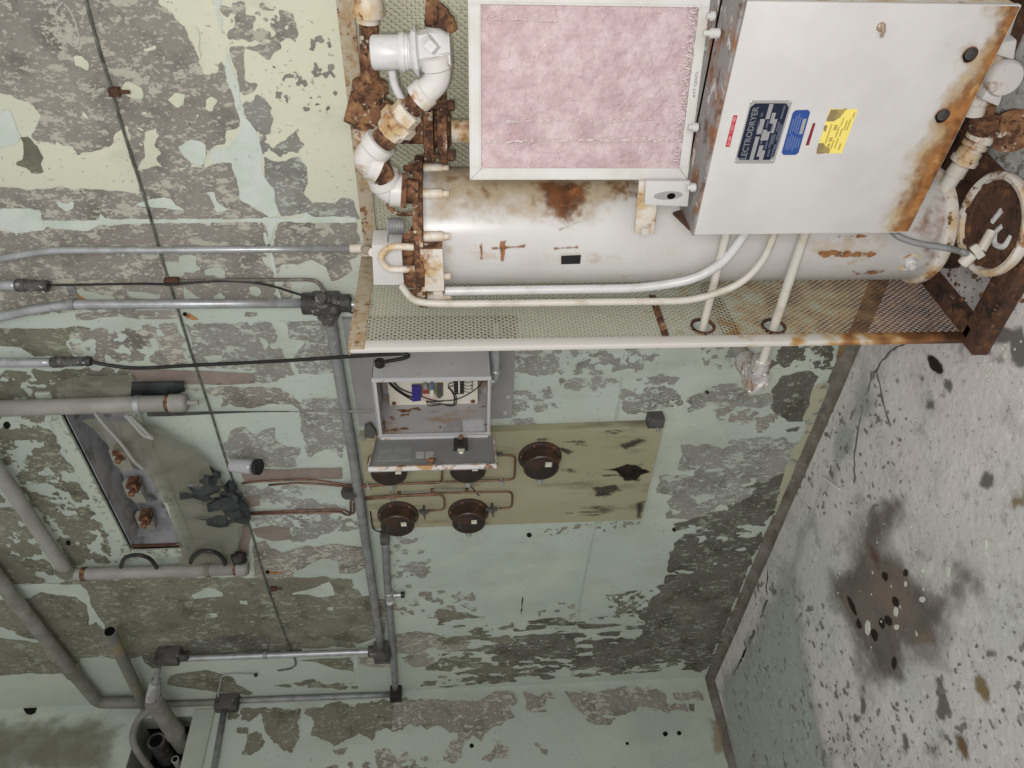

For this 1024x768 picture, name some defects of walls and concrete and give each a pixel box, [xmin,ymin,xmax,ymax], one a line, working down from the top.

peeling [0,0,360,468]
peeling [0,345,835,768]
damp [830,502,948,681]